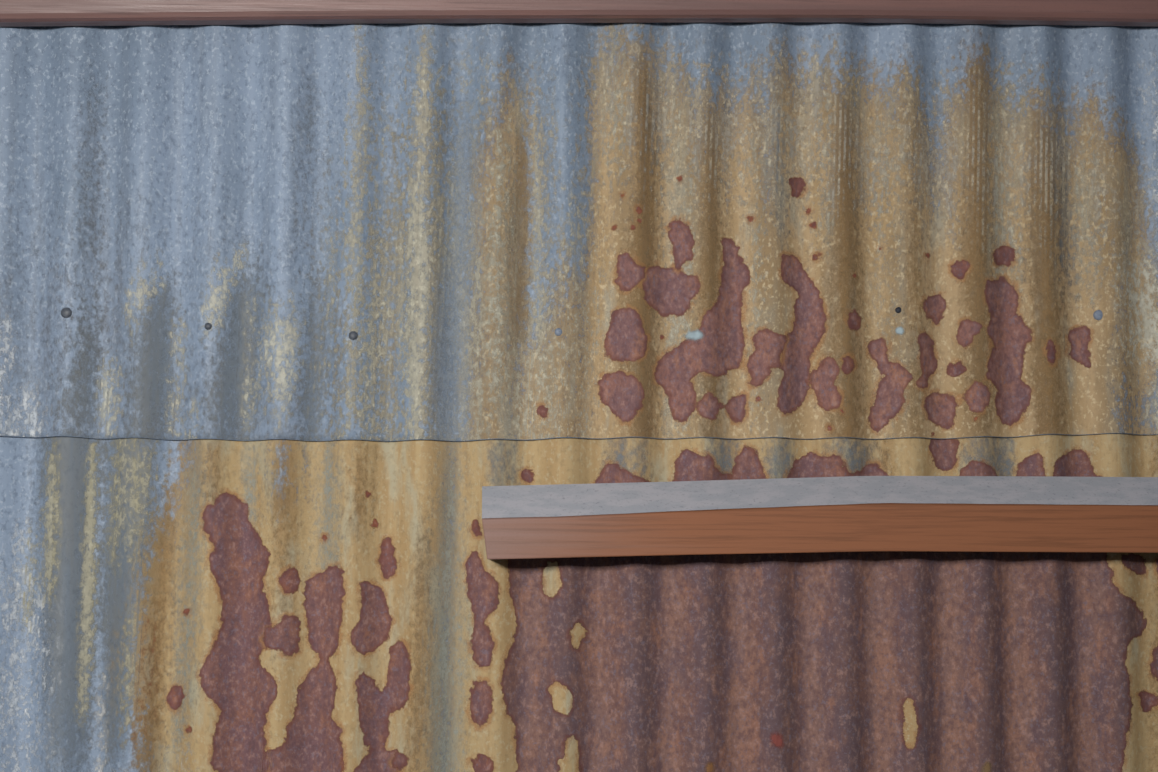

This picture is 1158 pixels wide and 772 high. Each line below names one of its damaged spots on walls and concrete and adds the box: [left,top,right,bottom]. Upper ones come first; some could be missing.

rust [327,57,372,285]
rust [259,300,305,423]
rust [23,442,61,631]
rust [76,443,99,717]
rust [108,438,157,560]